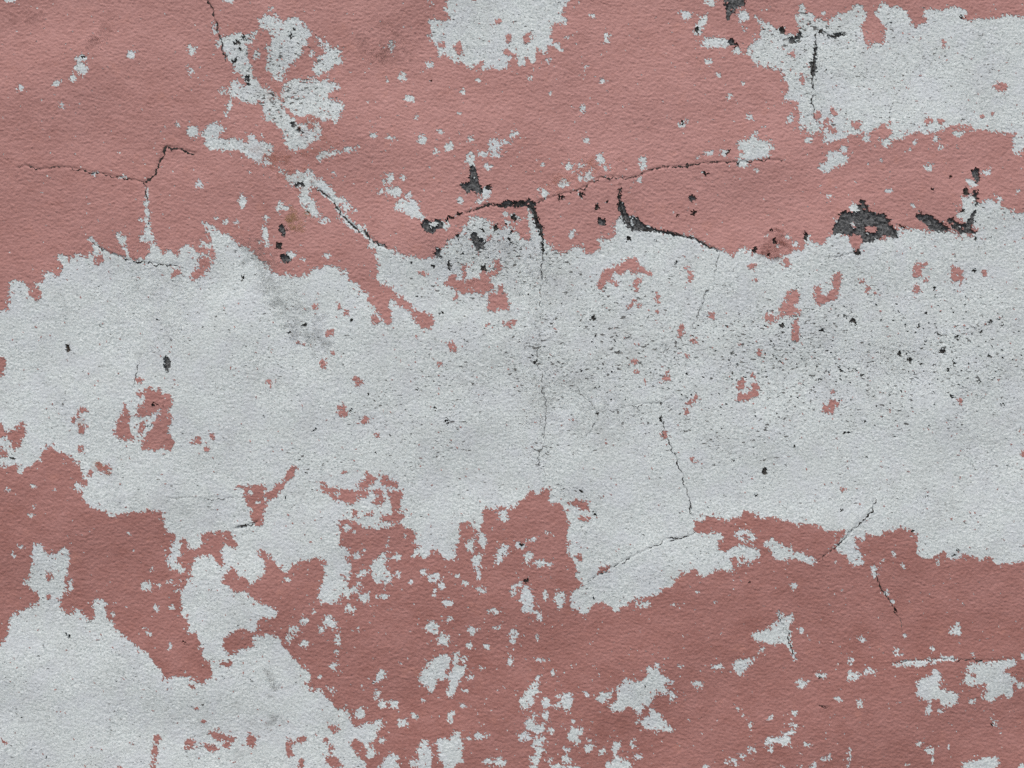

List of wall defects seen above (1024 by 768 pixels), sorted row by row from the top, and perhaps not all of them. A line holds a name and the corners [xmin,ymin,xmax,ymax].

spalling [175,43,207,91]
crack [207,0,226,61]
spalling [386,71,426,120]
peeling [420,0,608,91]
crack [810,30,846,119]
peeling [654,0,1024,203]
crack [18,145,196,225]
crack [313,185,387,247]
crack [90,240,178,267]
crack [578,389,692,578]
crack [822,502,877,560]